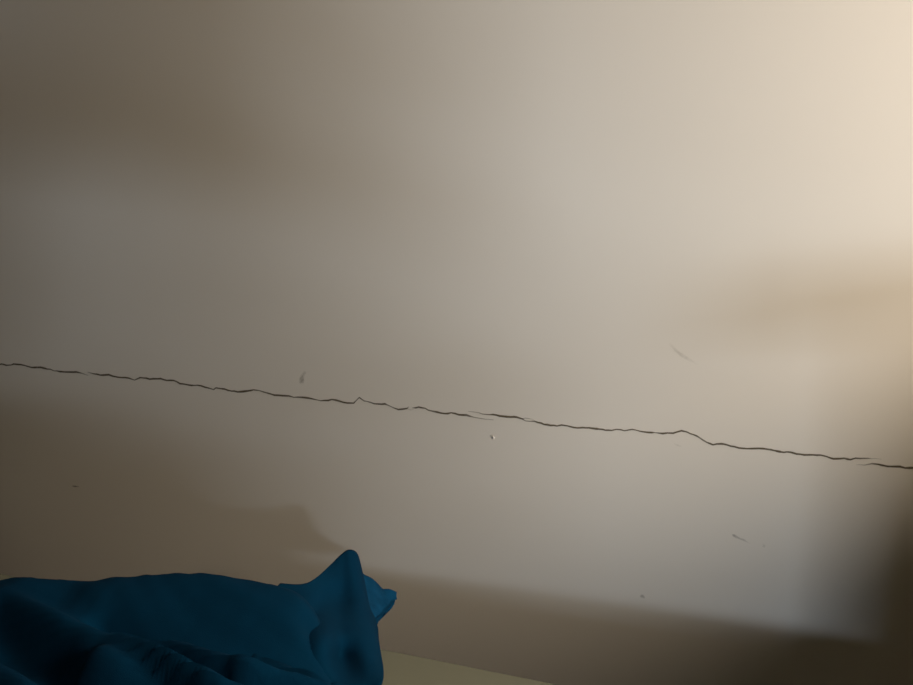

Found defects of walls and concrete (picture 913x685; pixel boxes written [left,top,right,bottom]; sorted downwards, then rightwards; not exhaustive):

crack [0,363,913,469]